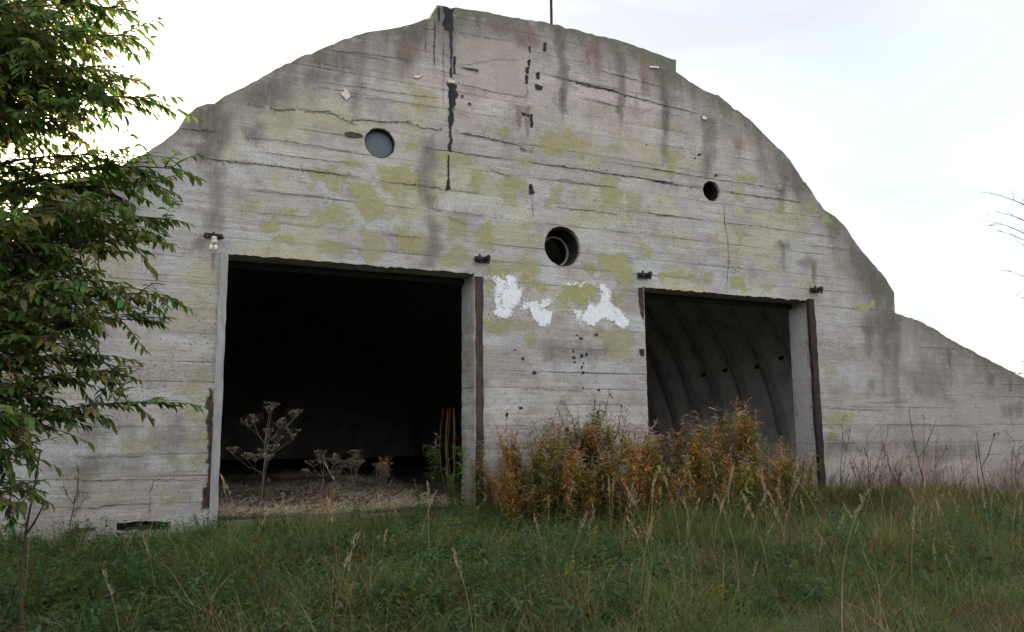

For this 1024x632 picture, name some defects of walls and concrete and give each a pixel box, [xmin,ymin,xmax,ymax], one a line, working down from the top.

damp [556,26,567,107]
crack [179,18,805,282]
peeling [492,273,629,336]